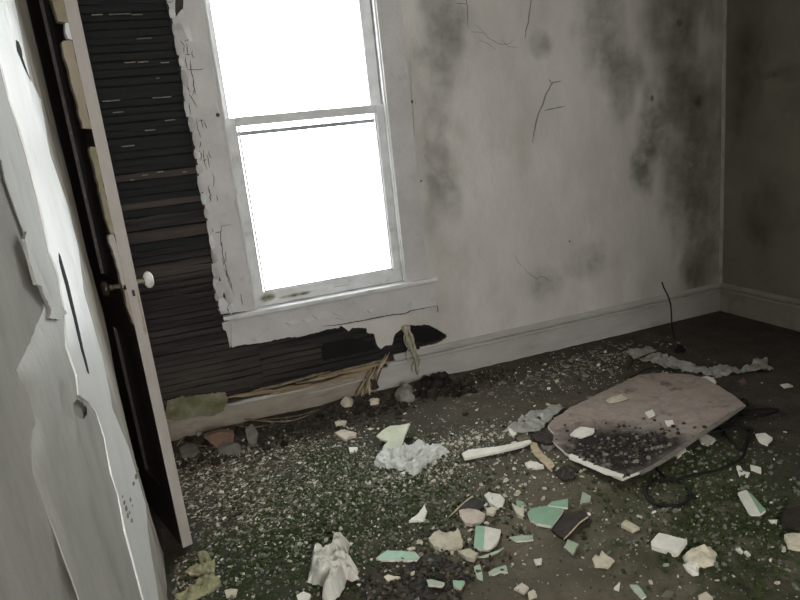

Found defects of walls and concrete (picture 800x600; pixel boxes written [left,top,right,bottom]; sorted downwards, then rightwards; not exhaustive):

crack [457,0,532,49]
crack [532,79,564,143]
flaking render [77,0,446,411]
crack [323,306,438,327]